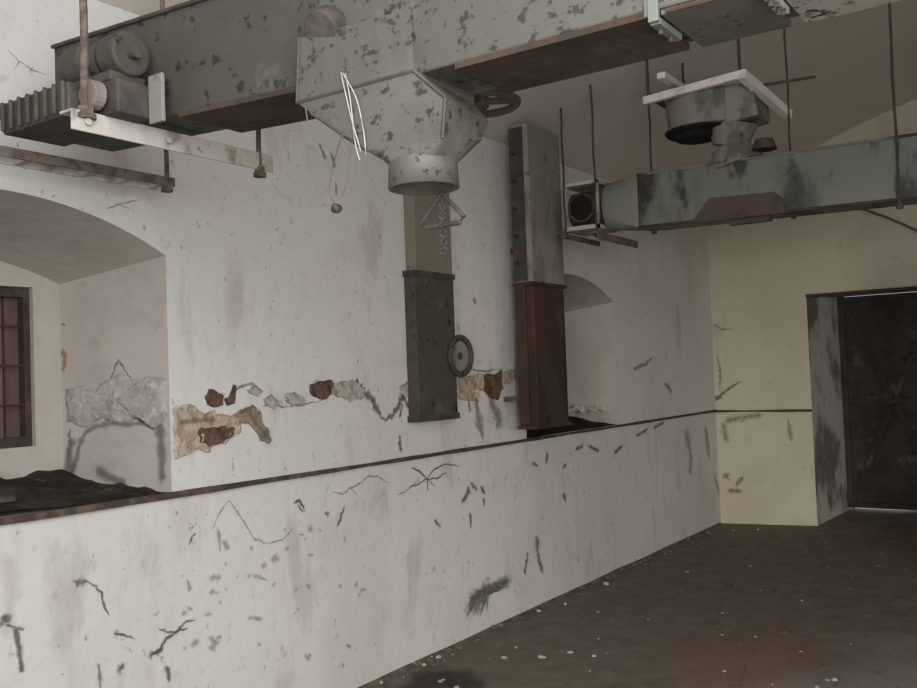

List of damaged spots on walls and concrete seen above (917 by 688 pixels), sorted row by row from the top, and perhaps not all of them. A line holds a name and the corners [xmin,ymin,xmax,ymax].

spalling [457,368,518,402]
spalling [173,379,365,460]
flaking render [67,421,145,473]
crack [339,463,457,495]
water stain [469,580,508,613]